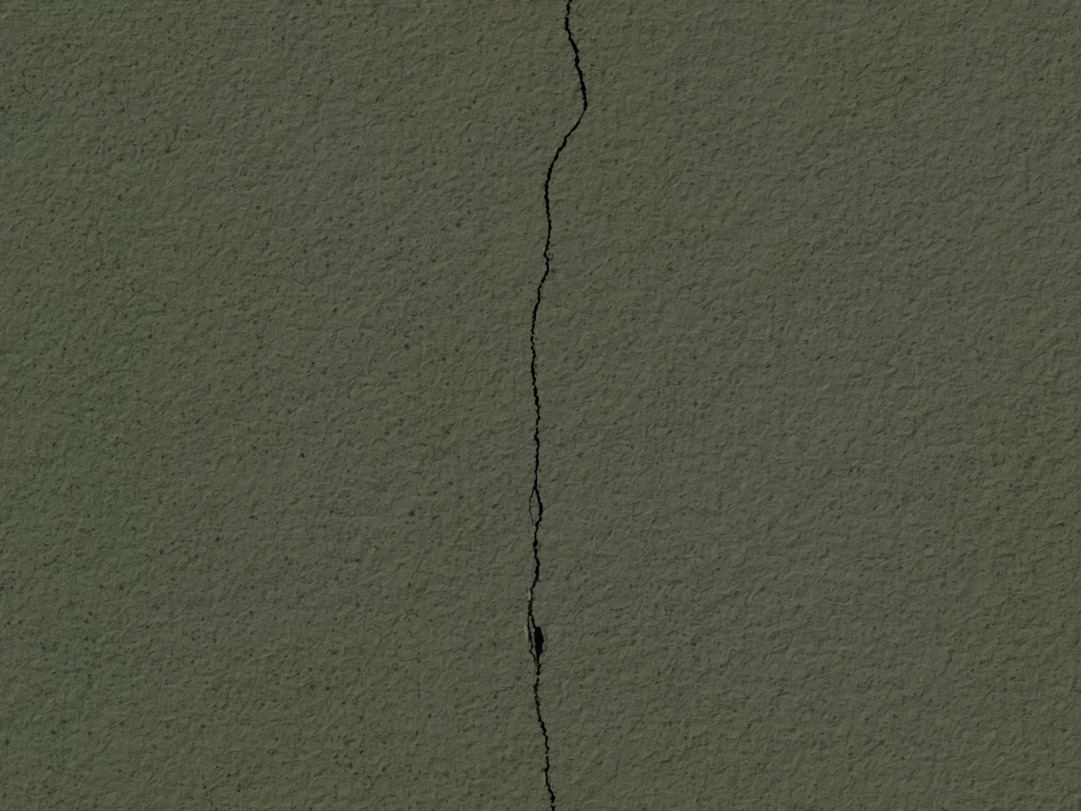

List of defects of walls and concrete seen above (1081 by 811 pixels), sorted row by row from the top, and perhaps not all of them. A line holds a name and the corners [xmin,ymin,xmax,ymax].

crack [524,0,588,811]